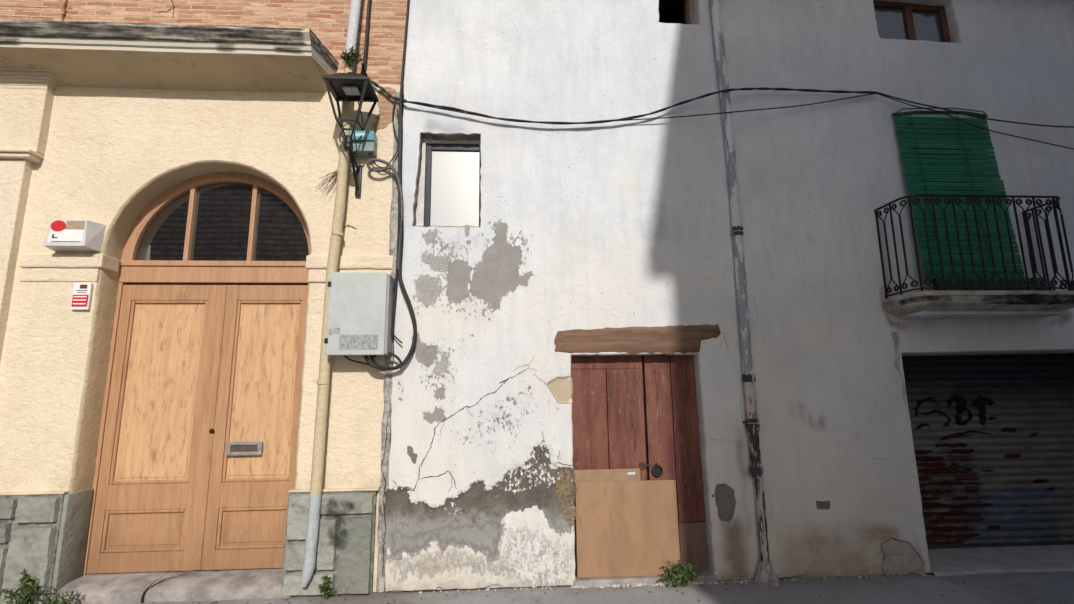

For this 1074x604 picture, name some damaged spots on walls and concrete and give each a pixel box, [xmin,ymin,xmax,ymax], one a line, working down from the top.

mould [0,20,339,74]
peeling [397,220,533,424]
crack [376,356,570,592]
flaking render [378,376,578,563]
flaking render [712,483,737,522]